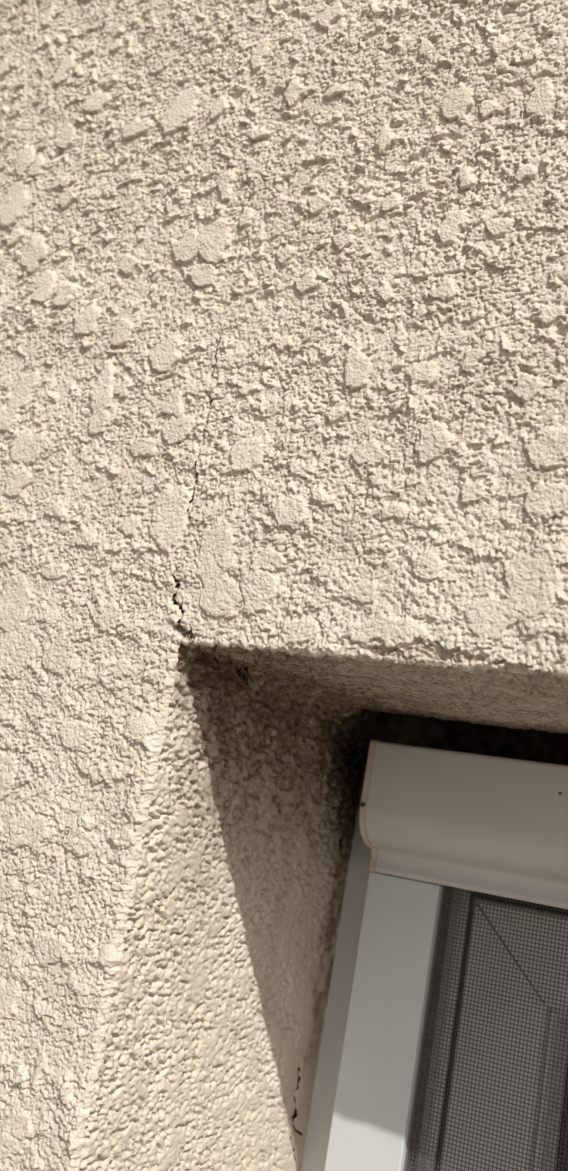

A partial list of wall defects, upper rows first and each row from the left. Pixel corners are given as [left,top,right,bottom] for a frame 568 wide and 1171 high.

crack [171,328,223,635]